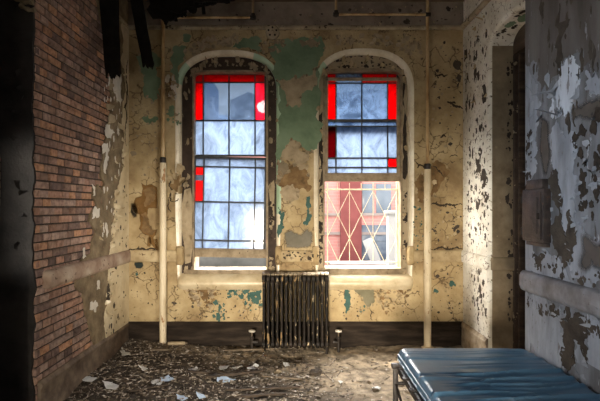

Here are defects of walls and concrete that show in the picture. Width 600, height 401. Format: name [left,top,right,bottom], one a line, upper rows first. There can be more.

peeling [496,0,600,222]
peeling [102,33,408,272]
peeling [92,187,129,248]
crack [432,201,462,209]
peeling [532,169,578,280]
peeling [177,283,262,322]
flaking render [330,283,420,320]
peeling [470,267,487,321]
peeling [572,271,600,288]
flaking render [527,297,600,372]